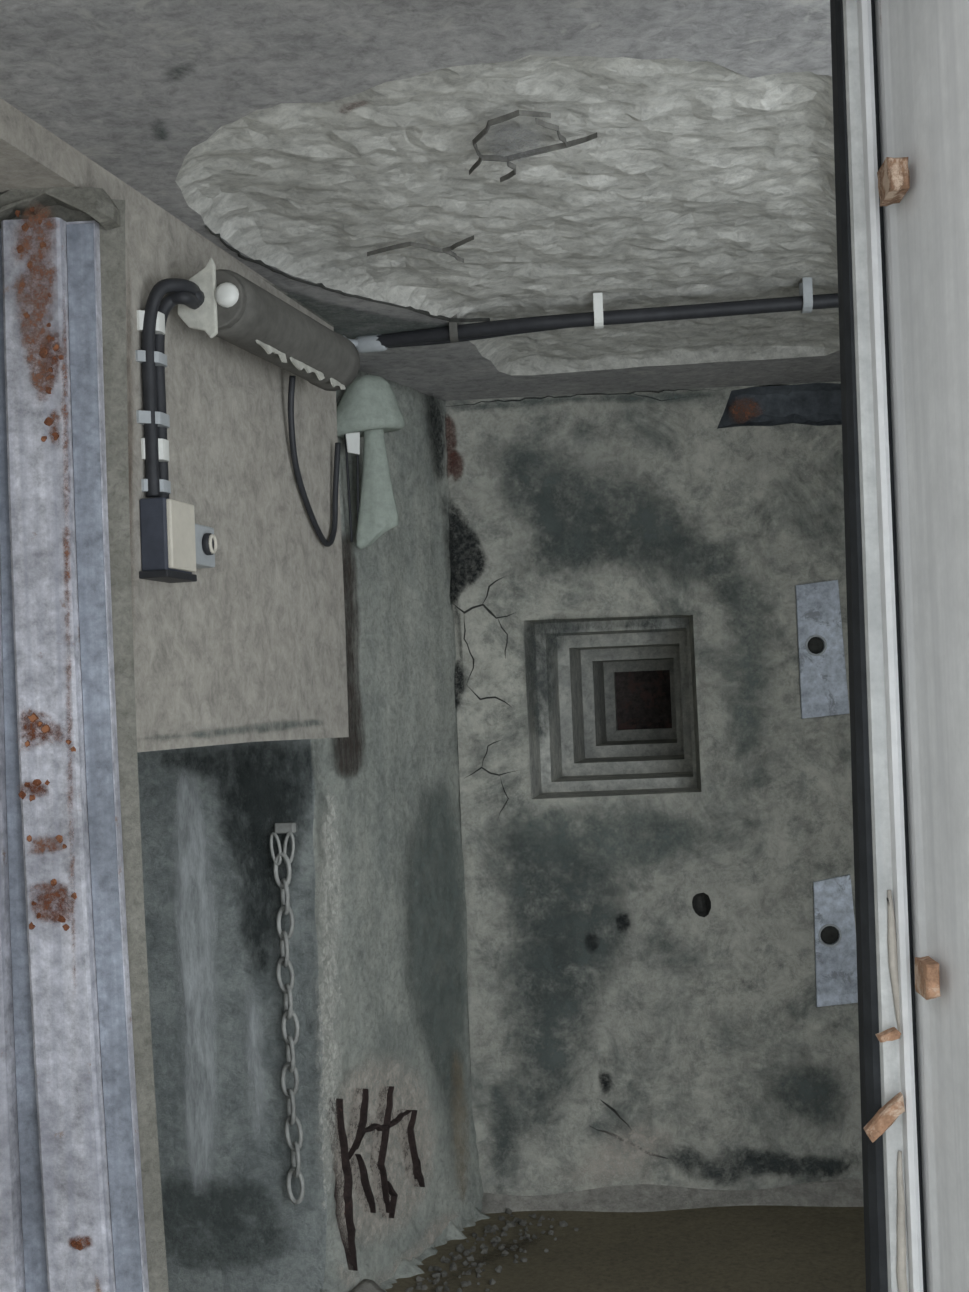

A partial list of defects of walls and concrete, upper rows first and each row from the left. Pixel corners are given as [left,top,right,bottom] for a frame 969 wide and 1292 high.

crack [469,110,597,182]
crack [205,225,490,322]
rust [15,205,70,508]
damp [504,451,765,745]
rust [18,779,50,802]
rust [21,664,76,800]
rust [27,821,77,939]
damp [163,782,281,1266]
damp [493,811,701,1158]
damp [775,1067,839,1122]
damp [675,1150,851,1184]
rust [69,1237,91,1251]